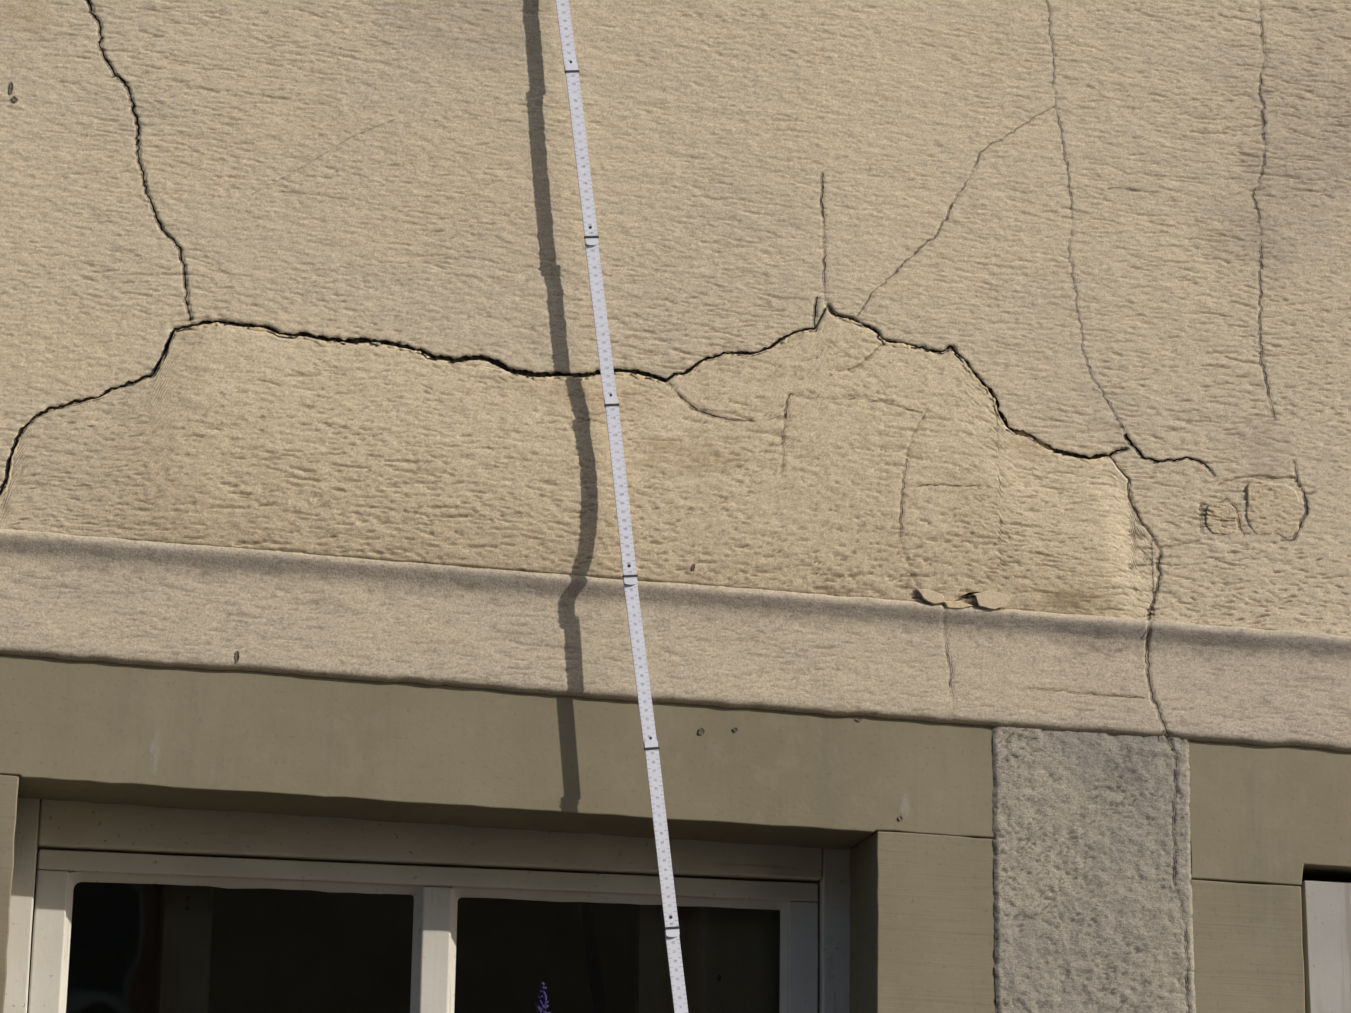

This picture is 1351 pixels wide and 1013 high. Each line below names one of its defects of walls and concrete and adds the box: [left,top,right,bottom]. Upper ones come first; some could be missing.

crack [0,0,601,497]
crack [1252,0,1277,420]
crack [614,0,1216,1013]
spalling [916,589,1011,610]